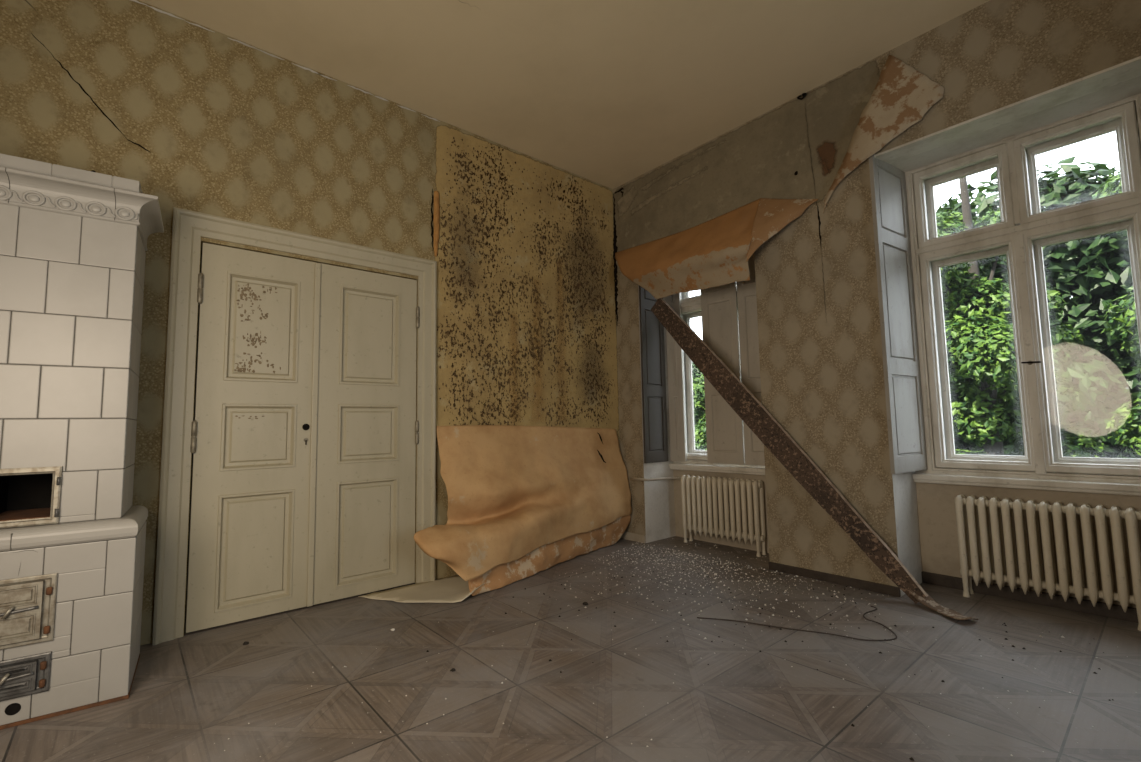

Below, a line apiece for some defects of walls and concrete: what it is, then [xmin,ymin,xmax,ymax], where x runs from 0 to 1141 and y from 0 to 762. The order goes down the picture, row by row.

crack [25,0,151,153]
flaking render [227,37,880,439]